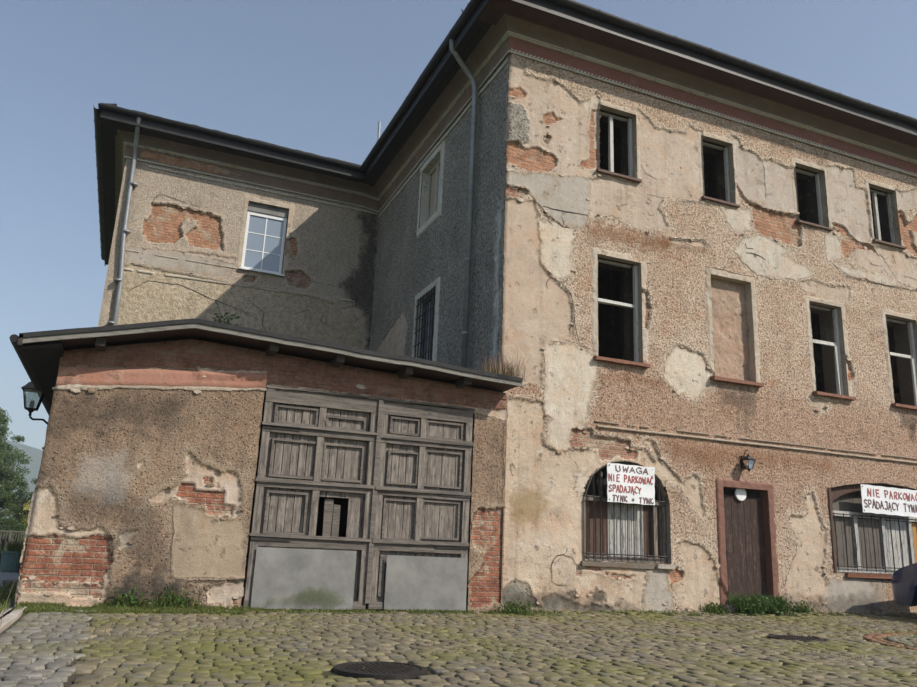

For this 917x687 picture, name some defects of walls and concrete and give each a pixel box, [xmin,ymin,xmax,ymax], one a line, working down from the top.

crack [132,276,266,331]
peeling [108,203,365,349]
damp [339,211,377,342]
crack [539,262,591,349]
peeling [502,56,708,249]
crack [669,234,766,277]
peeling [730,134,802,247]
peeling [826,165,917,289]
crack [836,251,916,291]
flaking render [17,484,139,607]
damp [109,572,190,605]
peeling [383,390,721,612]